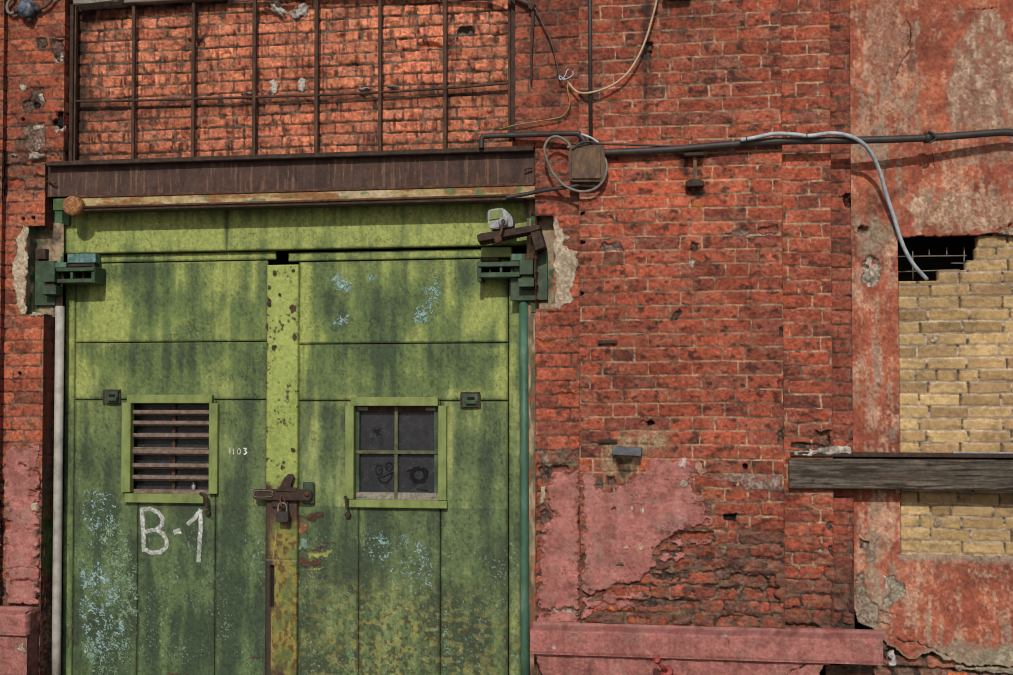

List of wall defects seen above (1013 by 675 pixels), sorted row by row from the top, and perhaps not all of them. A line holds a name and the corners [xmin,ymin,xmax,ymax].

spalling [14,84,66,153]
spalling [12,225,42,317]
spalling [553,217,585,309]
peeling [0,443,42,605]
peeling [537,458,737,622]
spalling [854,539,920,628]